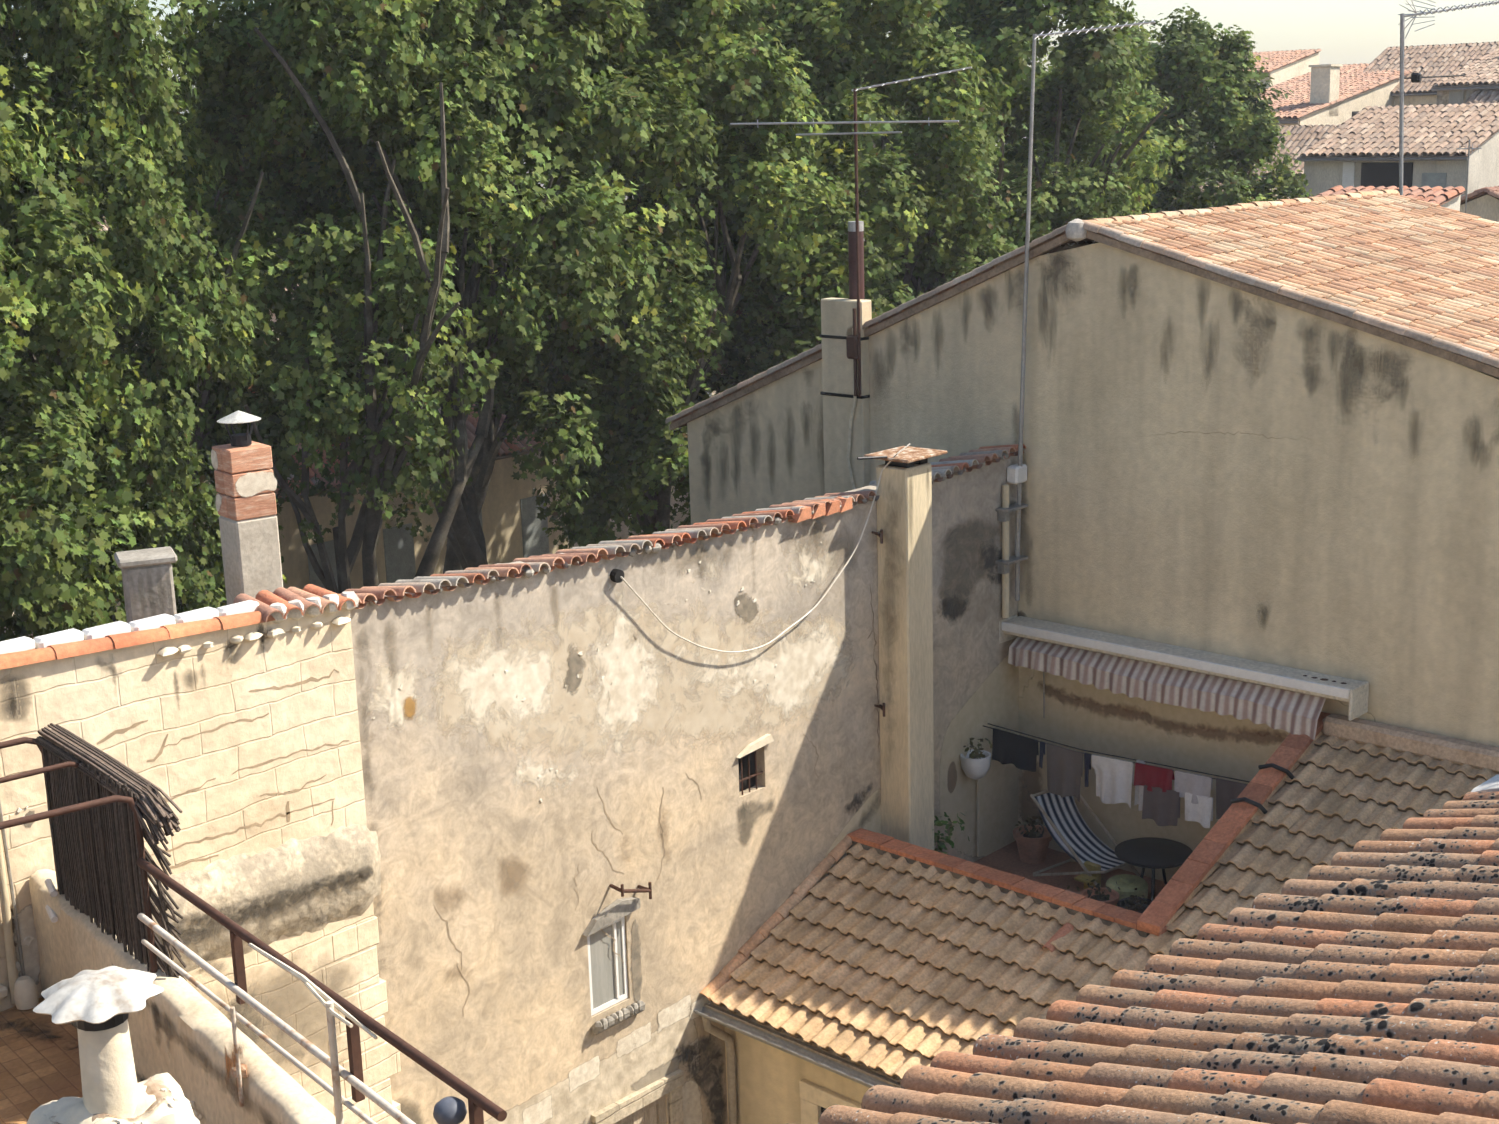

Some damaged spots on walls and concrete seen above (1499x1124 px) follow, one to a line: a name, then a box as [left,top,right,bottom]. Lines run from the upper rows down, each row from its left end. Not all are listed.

flaking render [734,587,759,622]
water stain [942,521,1002,619]
peeling [369,595,846,802]
water stain [155,866,372,951]
peeling [81,1077,203,1124]
water stain [676,1034,726,1124]